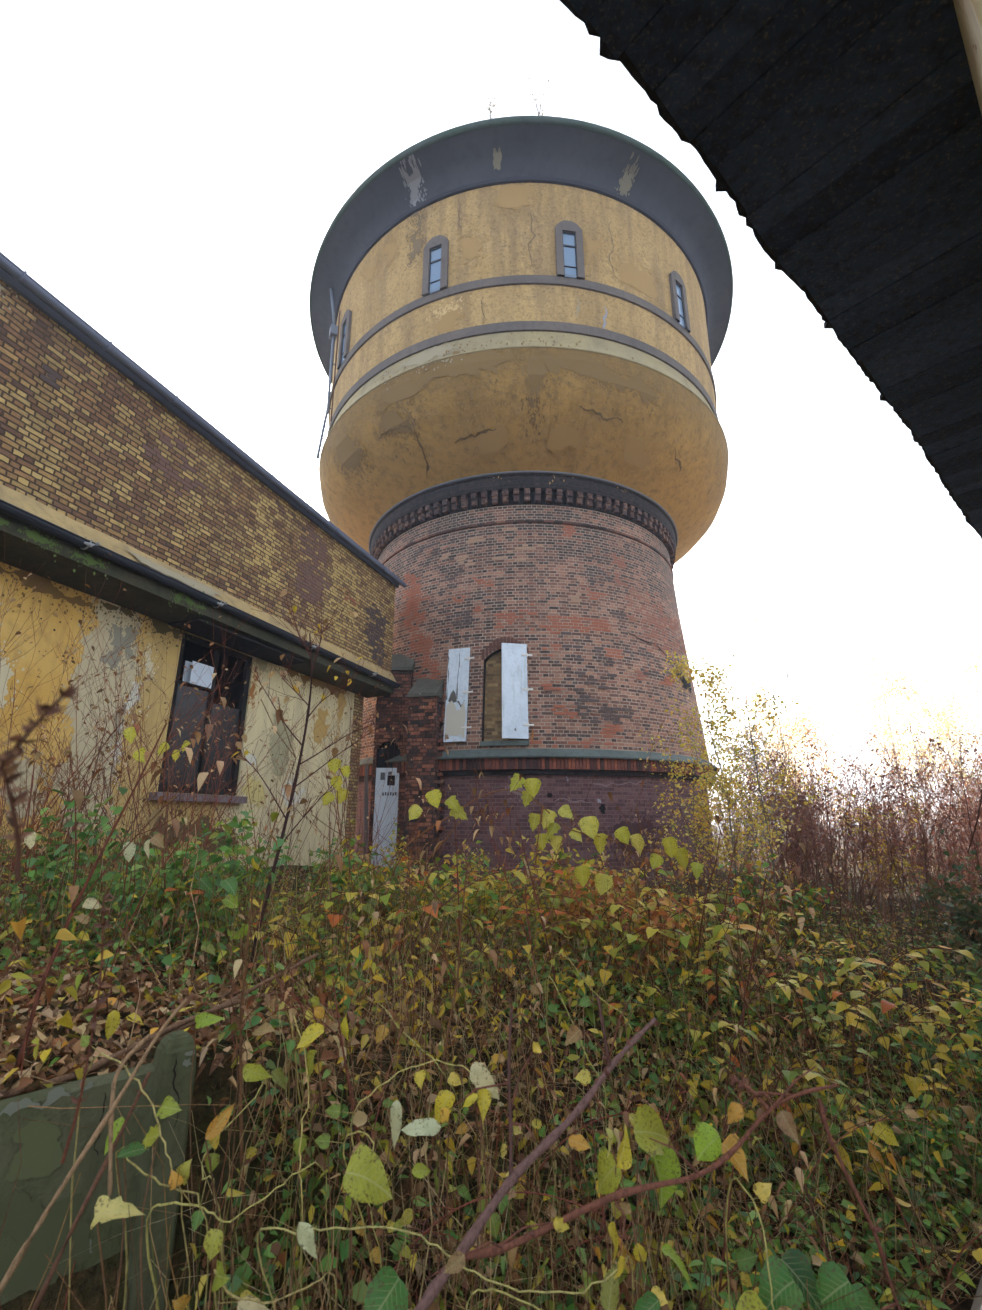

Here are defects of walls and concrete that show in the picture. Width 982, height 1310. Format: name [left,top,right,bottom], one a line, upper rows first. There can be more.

flaking render [0,596,159,843]